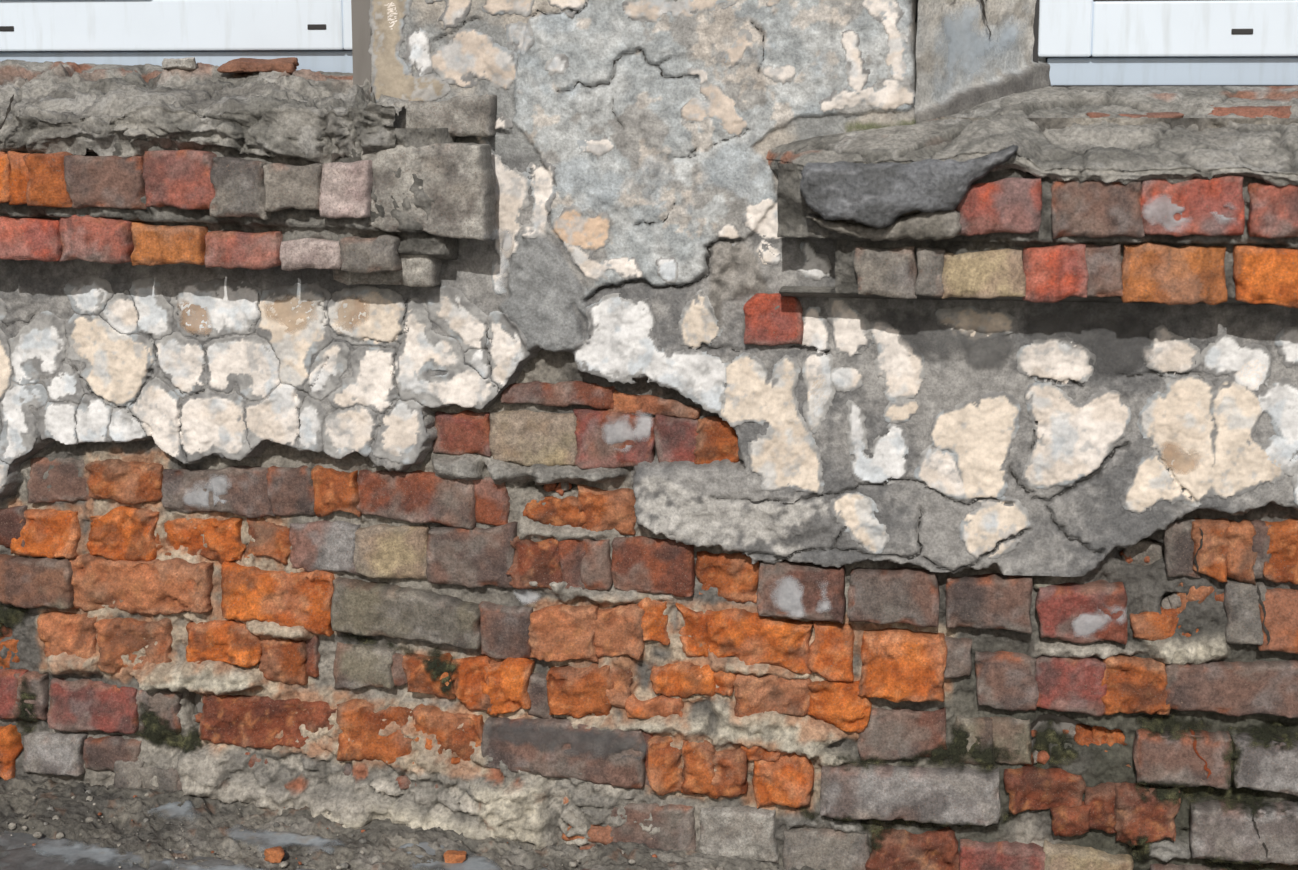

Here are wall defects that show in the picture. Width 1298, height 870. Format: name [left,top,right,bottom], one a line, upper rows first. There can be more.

crack [980,0,991,41]
crack [557,49,699,125]
peeling [368,0,1298,641]
peeling [0,274,947,765]
crack [717,422,1128,574]
crack [1194,528,1203,573]
spalling [1063,655,1171,752]
spalling [0,724,23,781]
spalling [646,736,814,808]
spalling [1004,730,1181,847]
spalling [865,826,959,870]